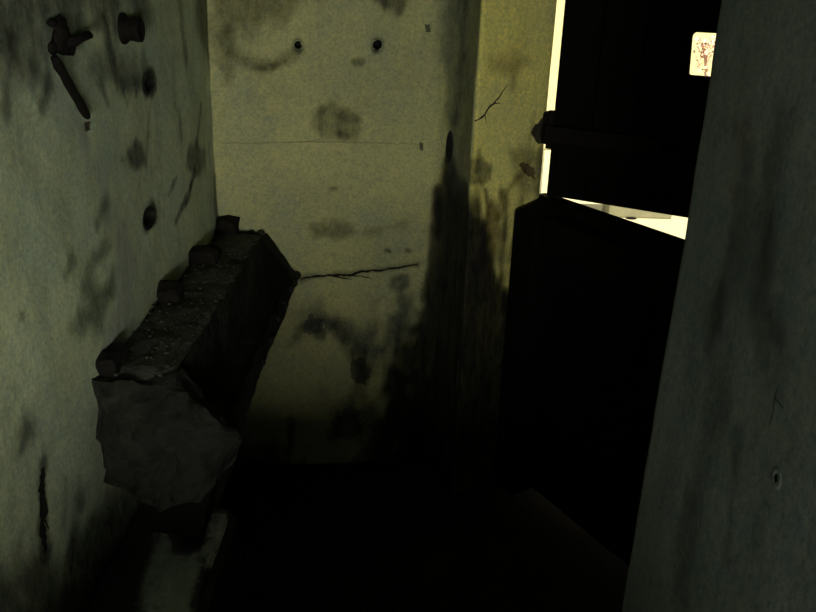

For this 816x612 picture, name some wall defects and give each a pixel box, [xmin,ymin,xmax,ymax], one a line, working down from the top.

crack [475,85,508,124]
crack [301,264,418,280]
leakage [311,128,509,495]
crack [38,462,50,558]